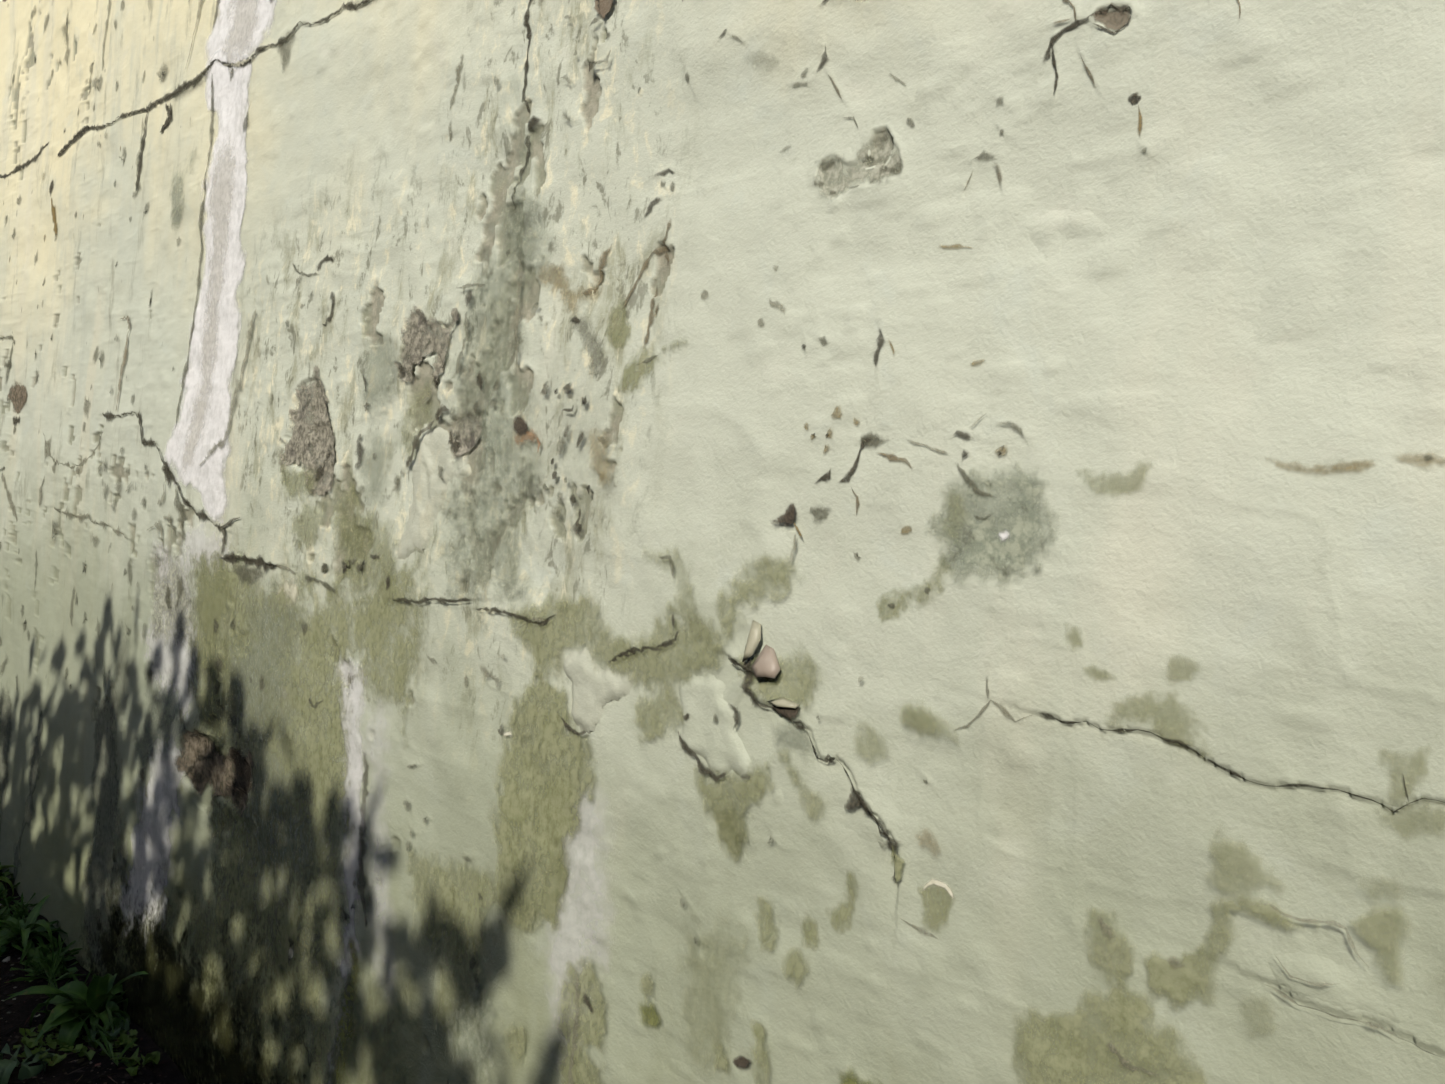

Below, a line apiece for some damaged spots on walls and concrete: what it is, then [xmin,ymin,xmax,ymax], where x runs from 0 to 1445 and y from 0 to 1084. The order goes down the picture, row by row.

crack [0,0,369,190]
peeling [1045,0,1131,92]
peeling [0,335,27,433]
crack [39,311,335,592]
spalling [279,366,335,495]
peeling [394,284,499,560]
crack [773,434,946,560]
damp [82,684,180,967]
damp [152,483,422,1037]
damp [493,557,792,930]
crack [729,657,904,882]
damp [1147,844,1294,1005]